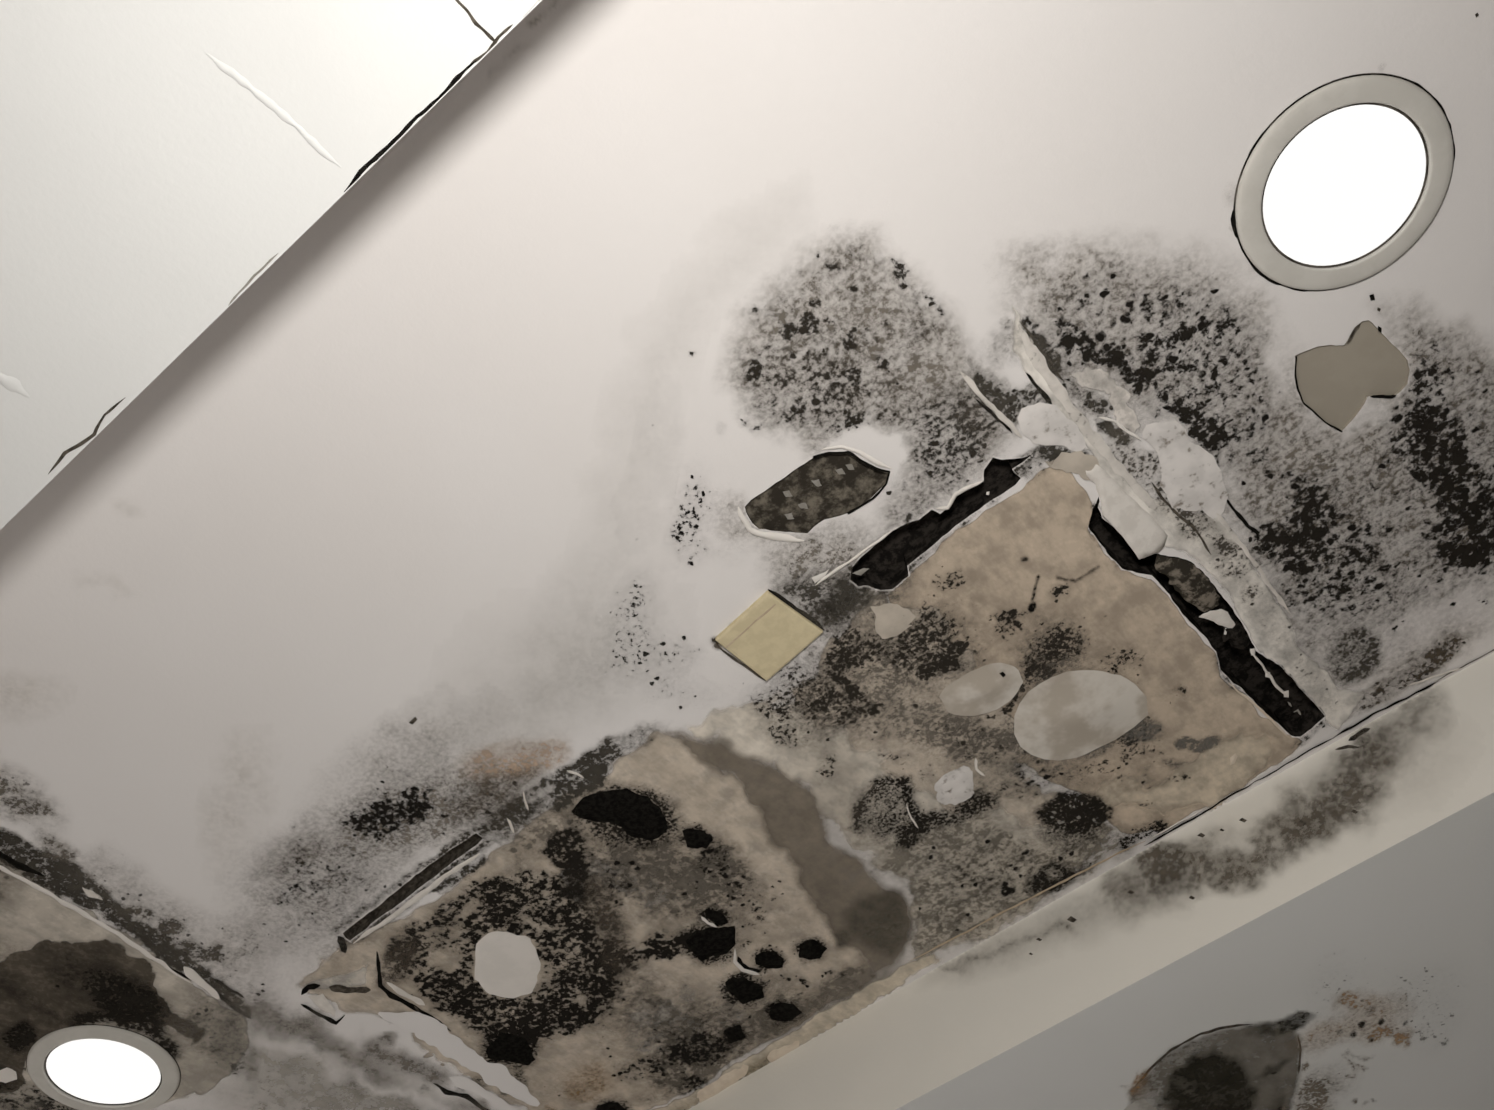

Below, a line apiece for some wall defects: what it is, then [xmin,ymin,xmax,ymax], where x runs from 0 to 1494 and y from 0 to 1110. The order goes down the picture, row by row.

crack [207,0,539,192]
water stain [1241,74,1455,176]
crack [0,372,30,398]
crack [48,398,125,474]
crack [228,253,278,306]
mould [738,245,999,509]
mould [1020,250,1494,711]
water stain [1231,206,1313,292]
peeling [1294,294,1410,432]
water stain [0,537,1417,1110]
flaking render [300,367,1302,1110]
flaking render [0,861,249,1110]